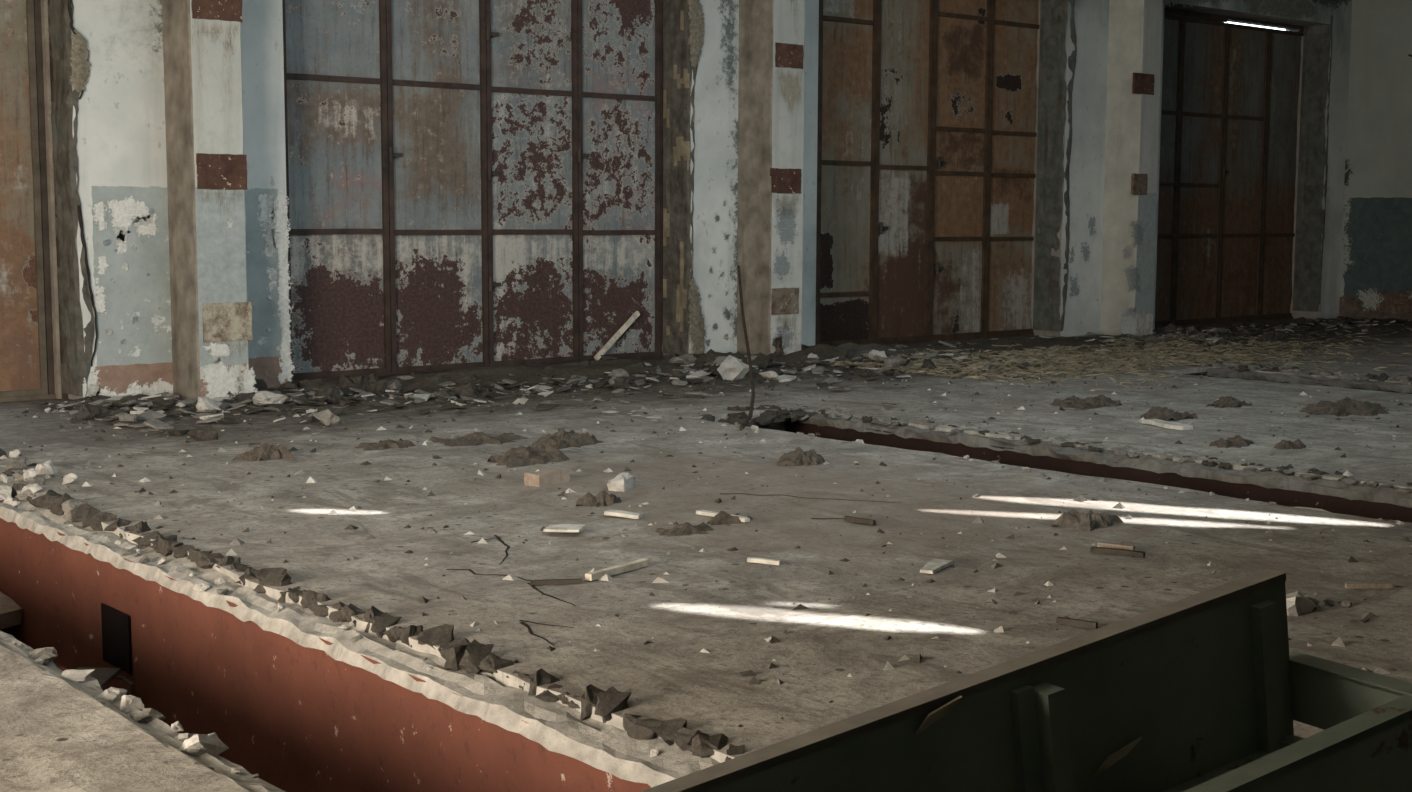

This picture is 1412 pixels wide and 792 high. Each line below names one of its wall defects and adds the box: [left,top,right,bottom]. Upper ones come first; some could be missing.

spalling [48,0,162,402]
peeling [201,342,258,399]
peeling [257,189,295,384]